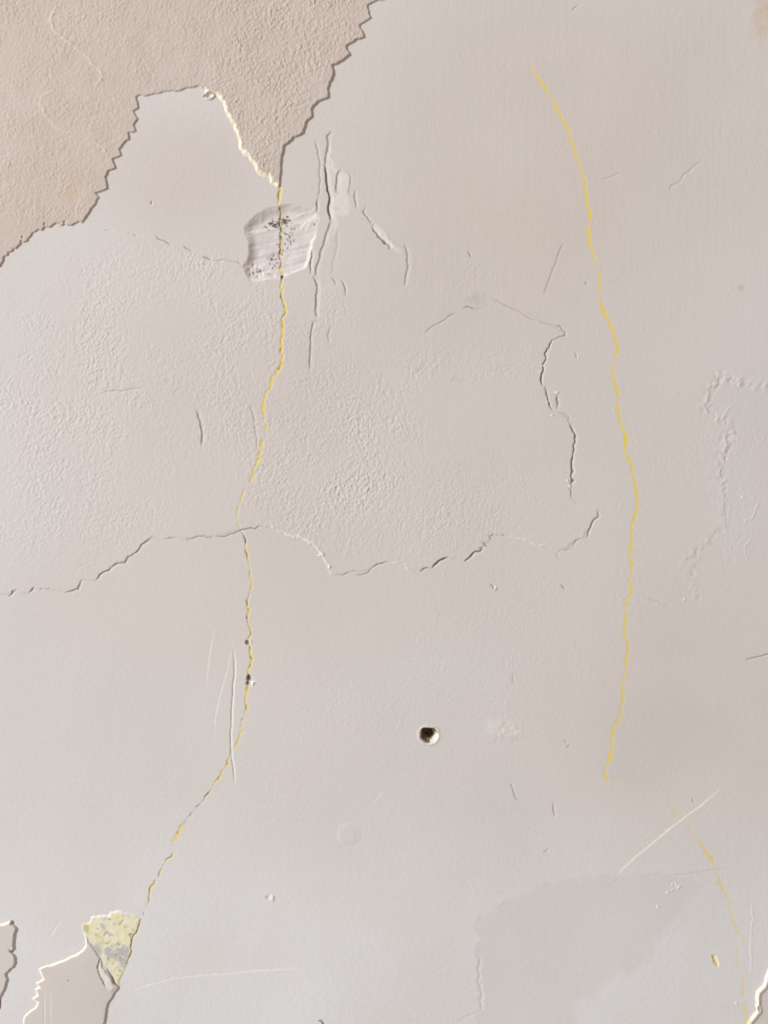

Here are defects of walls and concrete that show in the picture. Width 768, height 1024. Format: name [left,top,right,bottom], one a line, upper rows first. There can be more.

peeling [0,0,386,268]
flaking render [243,203,322,282]
crack [7,130,410,917]
crack [420,533,505,572]
crack [531,65,640,786]
peeling [0,920,18,1000]
peeling [23,910,142,1024]
crack [647,795,752,1024]